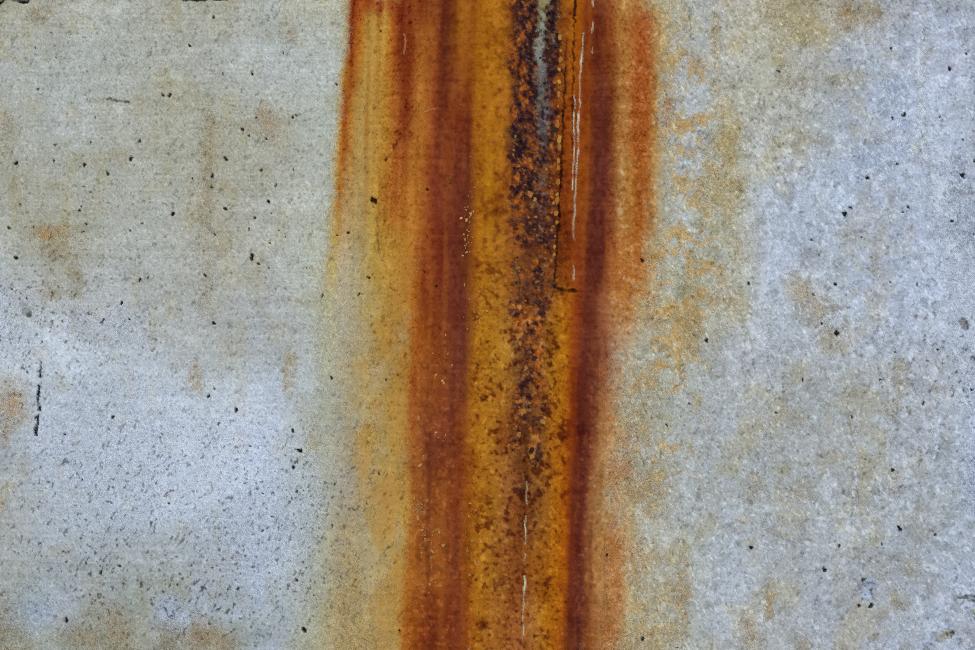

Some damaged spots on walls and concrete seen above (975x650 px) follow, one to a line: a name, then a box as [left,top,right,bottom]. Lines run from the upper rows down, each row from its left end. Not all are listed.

rust [280,0,752,650]